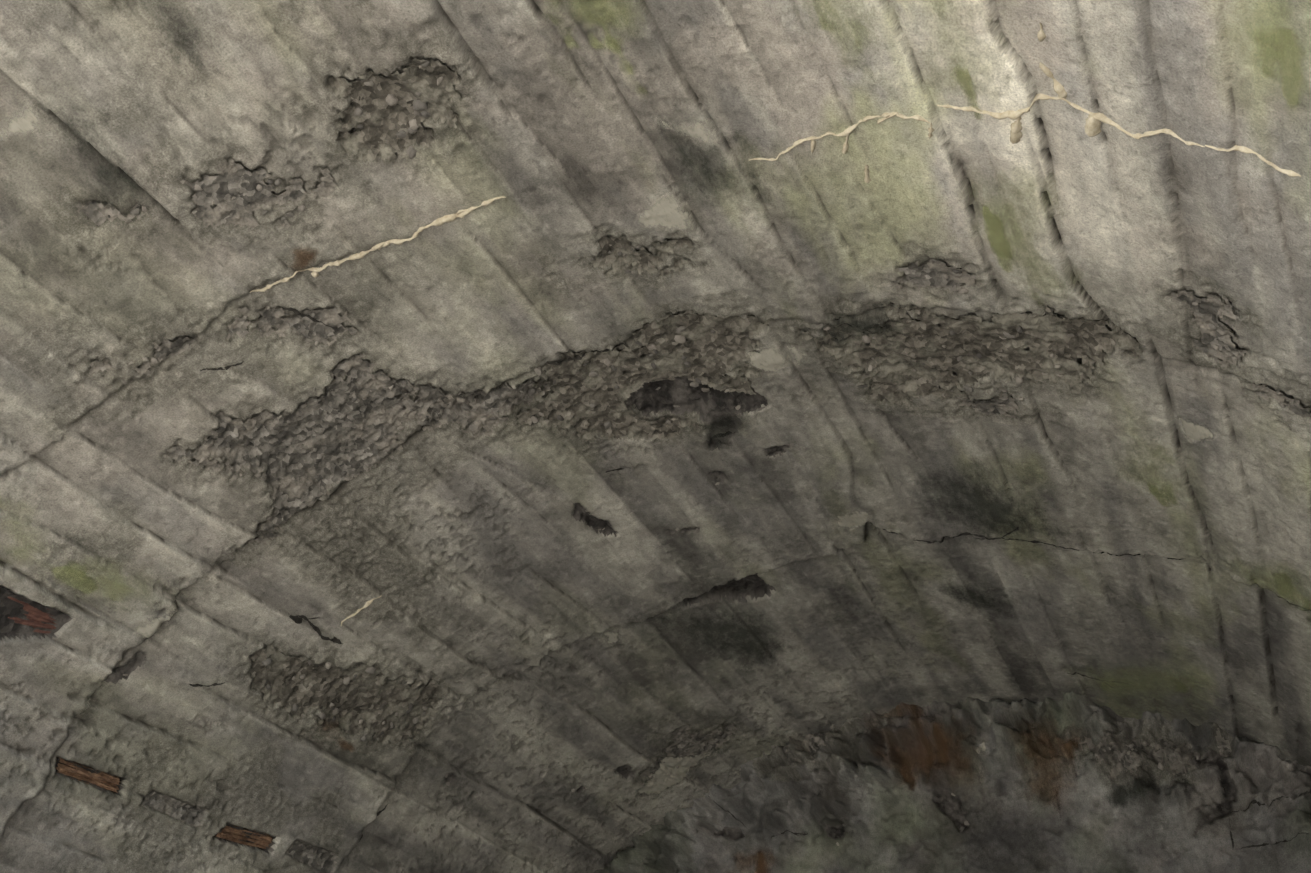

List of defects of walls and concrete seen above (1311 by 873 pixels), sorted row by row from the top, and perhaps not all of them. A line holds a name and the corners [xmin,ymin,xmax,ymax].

spalling [328,58,461,163]
spalling [180,159,337,229]
spalling [589,235,696,276]
spalling [795,257,1142,418]
spalling [163,306,769,546]
spalling [765,443,794,457]
crack [883,527,1204,560]
spalling [679,573,777,606]
spalling [249,645,442,747]